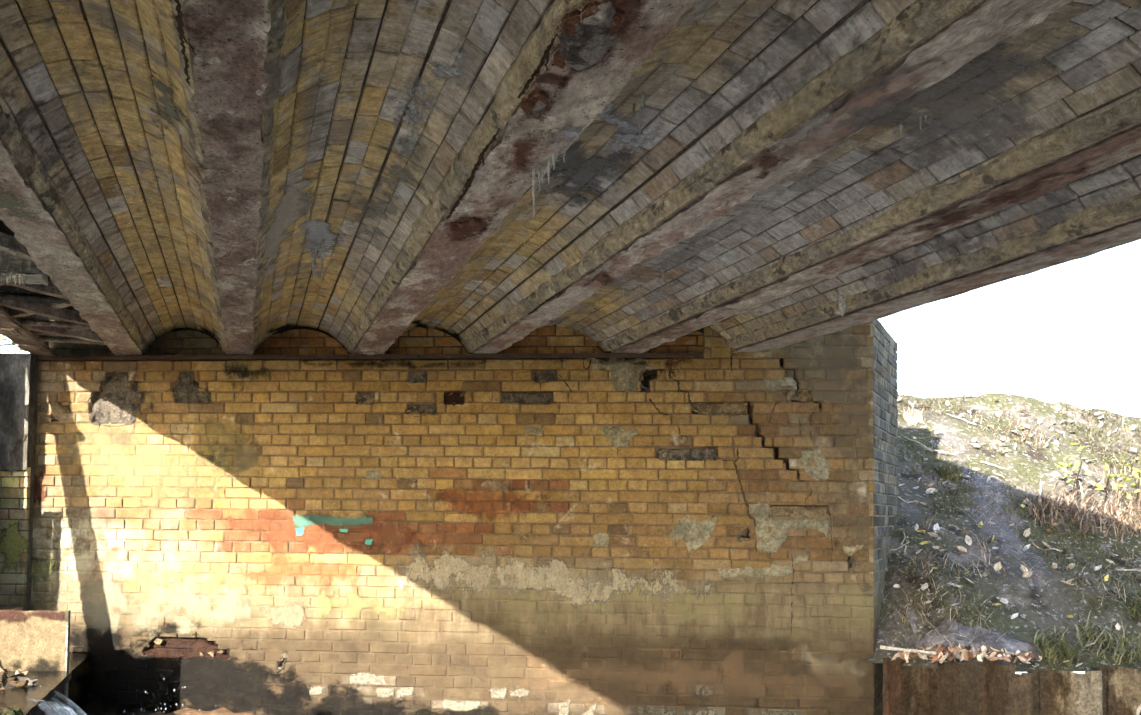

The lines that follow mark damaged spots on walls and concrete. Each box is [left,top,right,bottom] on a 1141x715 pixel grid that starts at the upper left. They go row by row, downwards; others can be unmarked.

rust [510,0,646,184]
rust [445,209,498,241]
spalling [87,373,143,426]
spalling [173,372,211,404]
crack [649,370,709,440]
crack [721,358,833,562]
rust [437,483,547,519]
rust [227,509,421,585]
efflorescence [397,543,711,611]
water stain [8,658,58,671]
water stain [34,571,862,715]